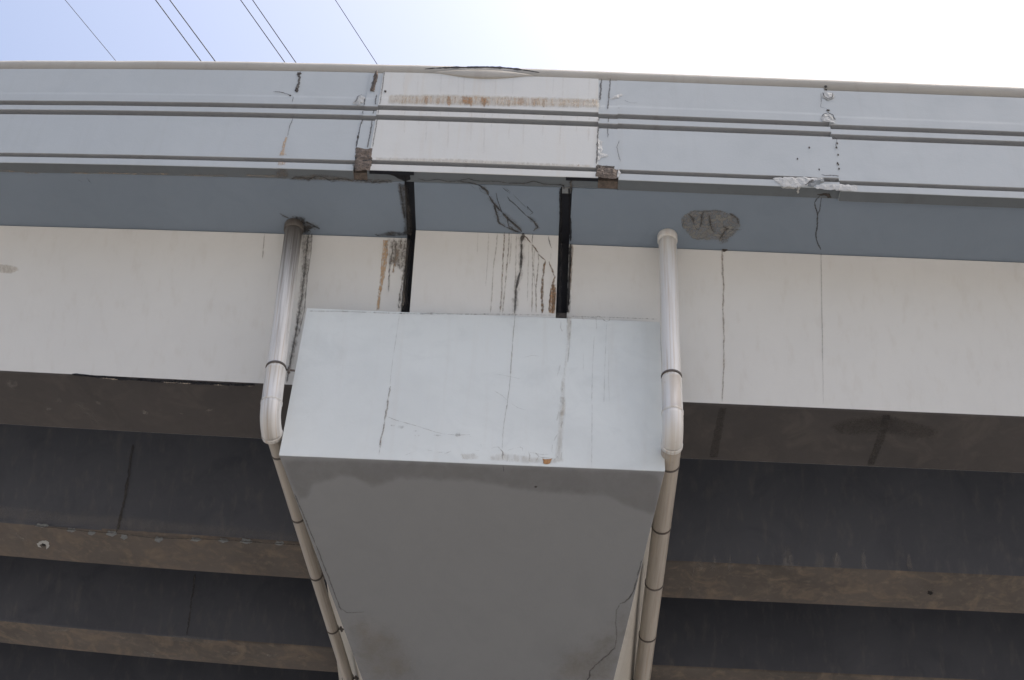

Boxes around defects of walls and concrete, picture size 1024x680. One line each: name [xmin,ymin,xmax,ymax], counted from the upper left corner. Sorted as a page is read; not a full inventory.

crack [274,72,302,126]
crack [356,73,385,147]
spalling [821,85,836,123]
spalling [353,147,372,171]
spalling [595,165,621,179]
peeling [773,142,858,194]
crack [422,179,572,275]
crack [814,193,831,249]
rust [377,240,398,309]